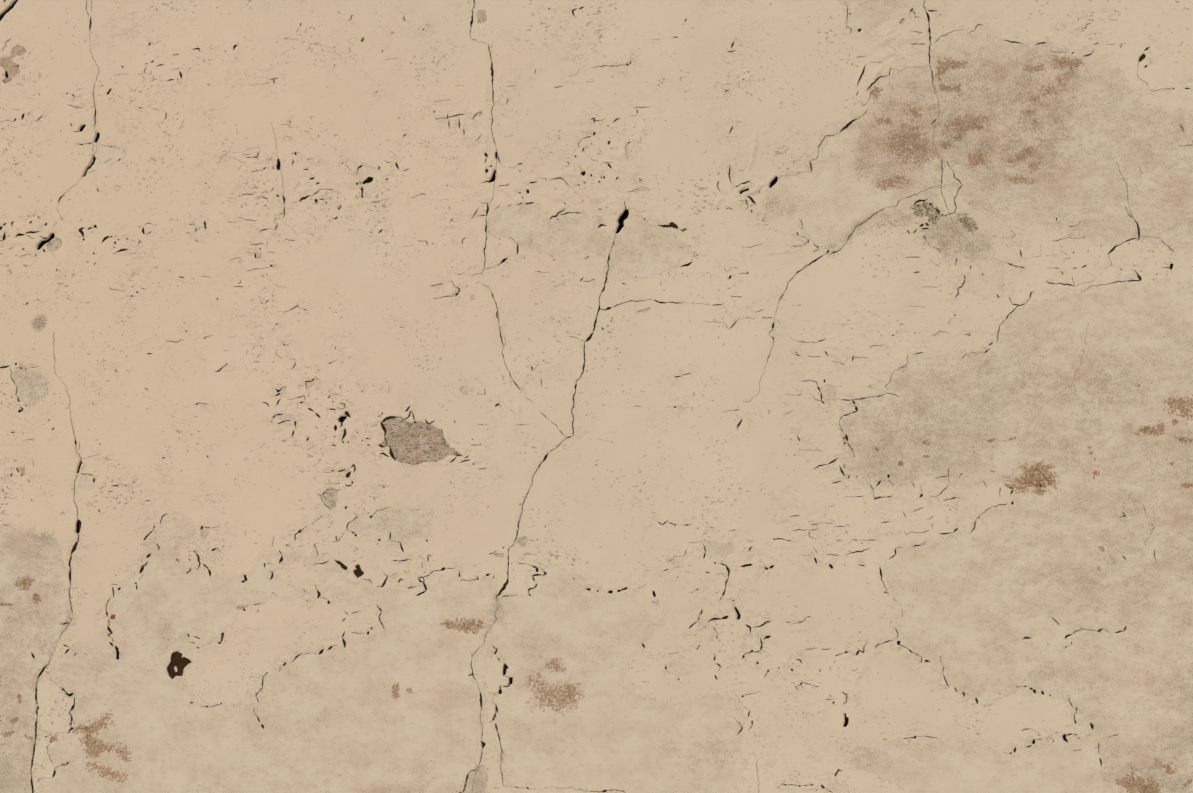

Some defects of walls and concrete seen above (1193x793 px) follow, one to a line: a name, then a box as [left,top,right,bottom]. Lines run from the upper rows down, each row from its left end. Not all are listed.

crack [0,0,18,21]
crack [57,0,100,223]
water stain [912,199,940,224]
crack [1105,170,1173,269]
peeling [263,343,485,469]
crack [458,0,1024,793]
corrosion [1134,395,1193,443]
corrosion [1005,461,1061,495]
crack [30,332,100,793]
peeling [0,464,856,793]
corrosion [527,659,580,711]
corrosion [71,713,131,782]